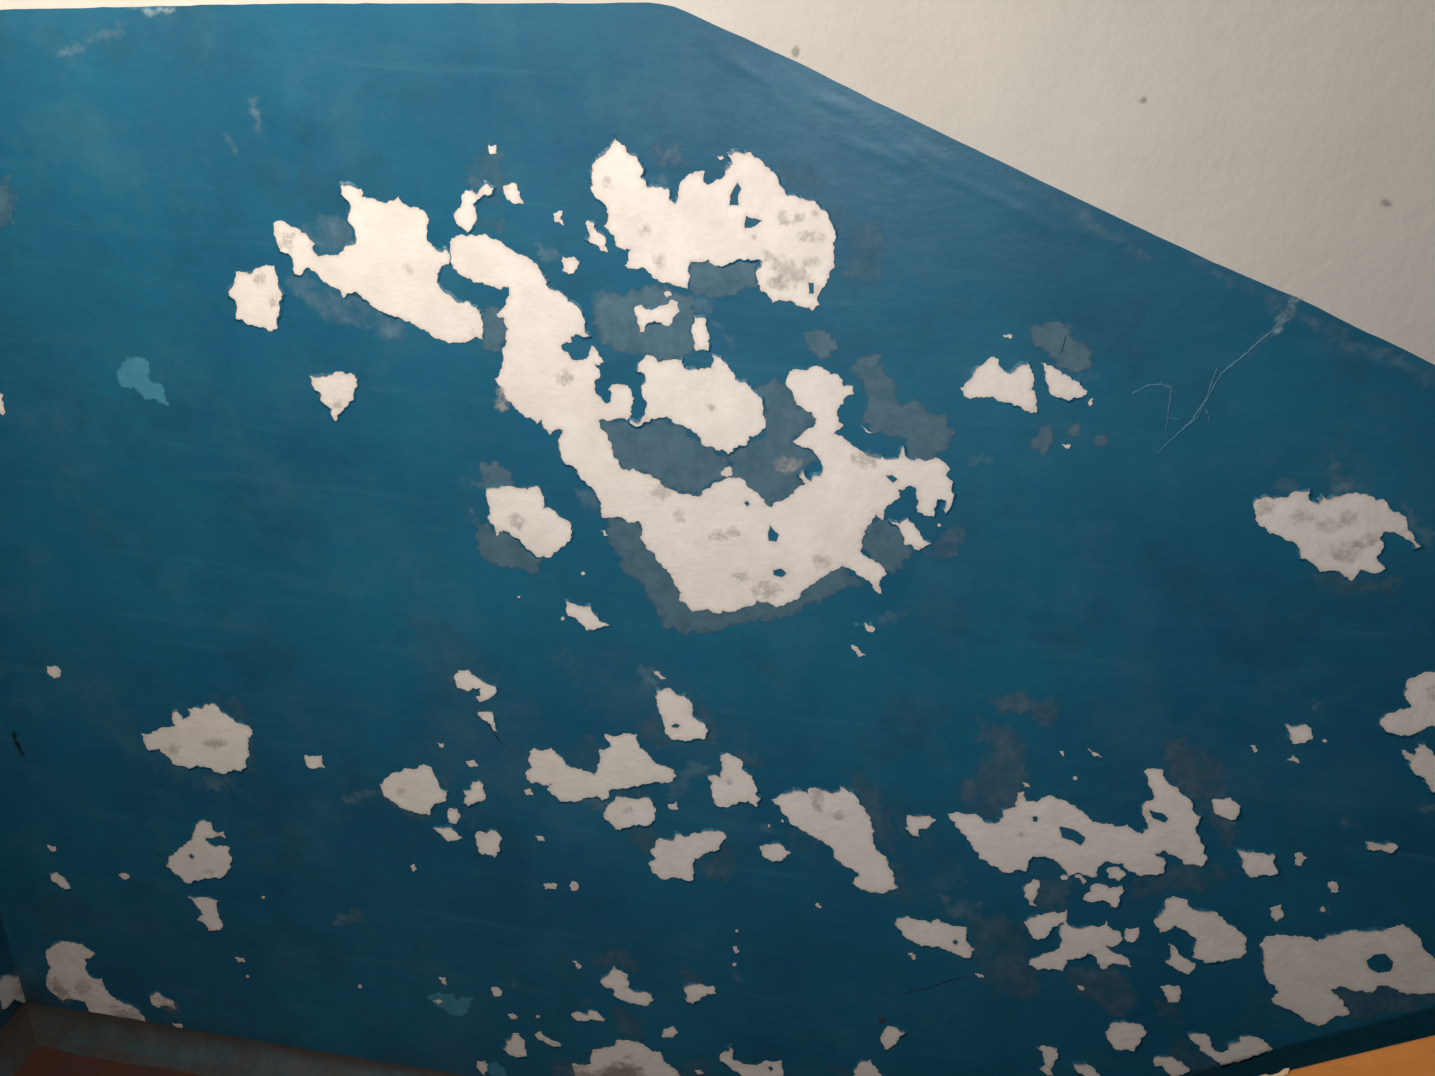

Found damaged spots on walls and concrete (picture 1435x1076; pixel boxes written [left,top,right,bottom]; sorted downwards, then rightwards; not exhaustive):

peeling [225,135,961,633]
peeling [961,322,1093,454]
peeling [1251,484,1423,589]
peeling [141,702,253,774]
peeling [379,760,502,857]
peeling [524,671,898,894]
peeling [1283,722,1327,763]
peeling [1377,670,1435,794]
peeling [165,818,233,932]
peeling [893,733,1435,1076]
peeling [45,940,183,1028]
peeling [554,1040,784,1076]